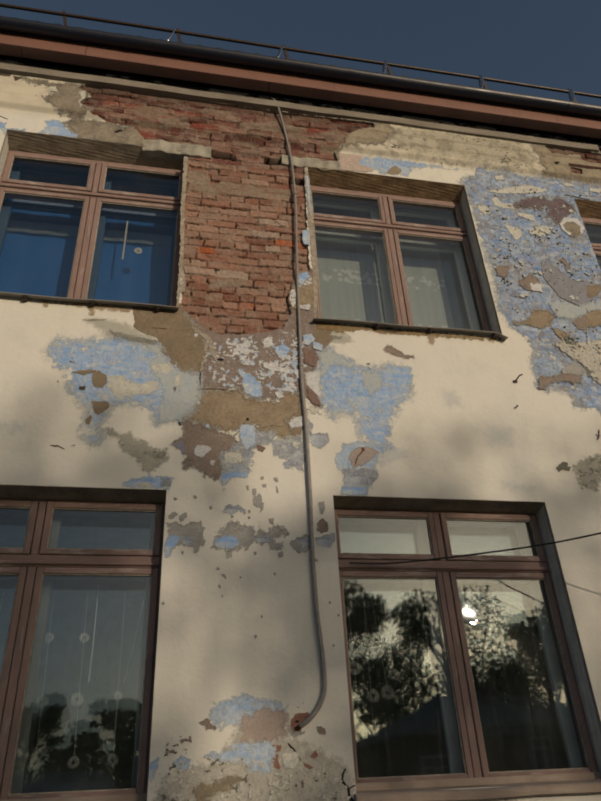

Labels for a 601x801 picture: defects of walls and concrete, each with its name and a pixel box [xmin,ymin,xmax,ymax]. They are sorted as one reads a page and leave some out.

flaking render [21,76,601,558]
peeling [149,693,355,801]
crack [341,768,355,801]